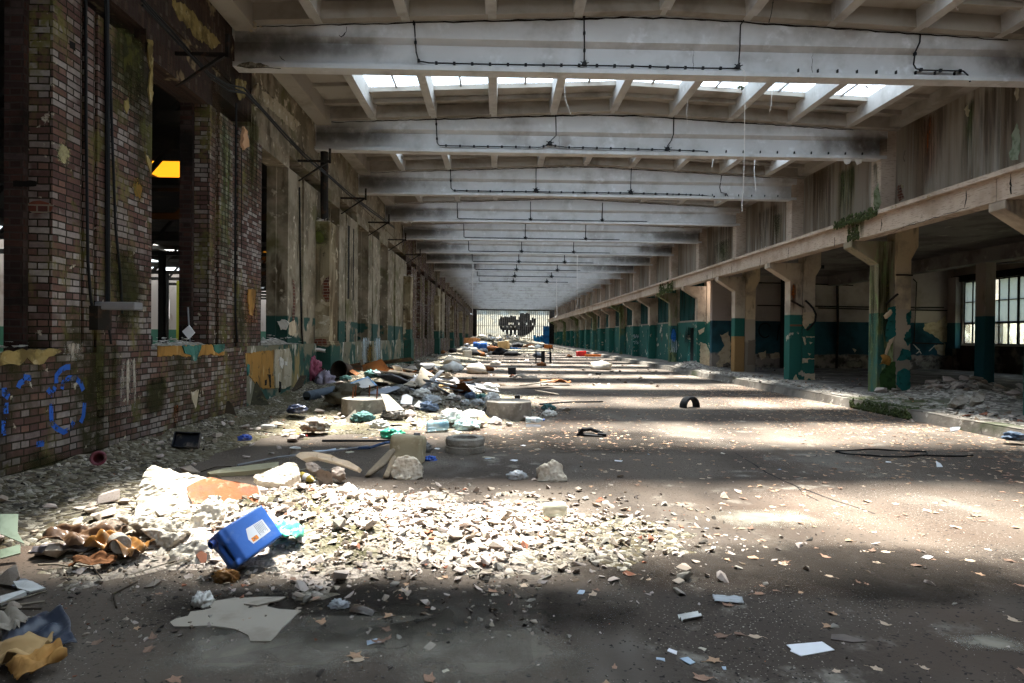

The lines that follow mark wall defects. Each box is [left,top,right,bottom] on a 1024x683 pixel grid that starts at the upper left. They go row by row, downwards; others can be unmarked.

peeling [240,126,250,150]
peeling [0,345,62,366]
peeling [152,337,225,361]
peeling [245,281,327,393]
peeling [793,311,815,380]
peeling [879,306,947,391]